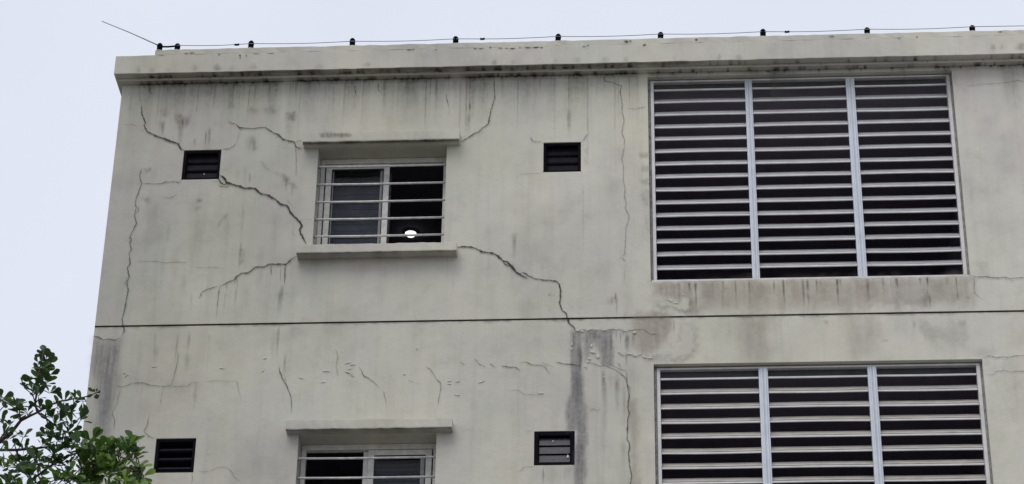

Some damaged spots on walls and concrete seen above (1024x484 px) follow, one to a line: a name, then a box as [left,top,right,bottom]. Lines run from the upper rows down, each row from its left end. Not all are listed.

crack [141,107,183,150]
crack [227,122,300,149]
crack [462,81,495,141]
crack [200,175,306,305]
crack [458,246,575,329]
crack [462,360,632,484]